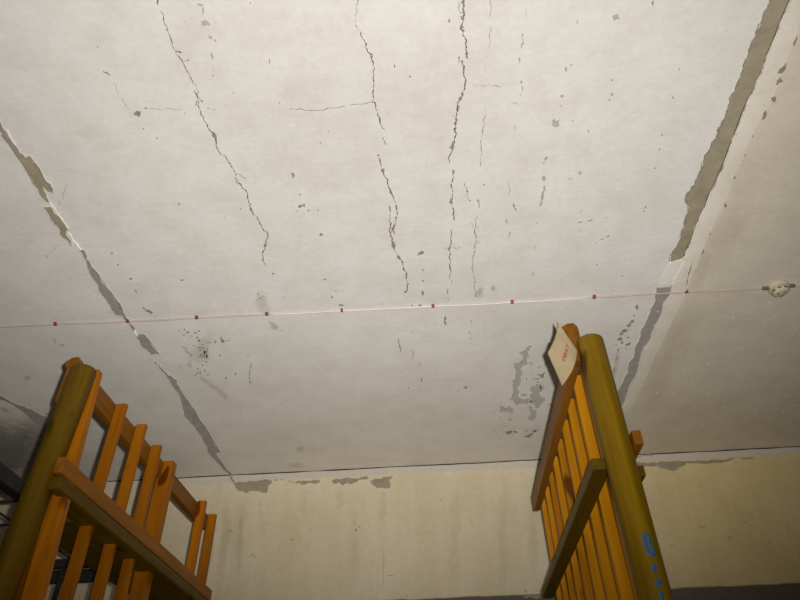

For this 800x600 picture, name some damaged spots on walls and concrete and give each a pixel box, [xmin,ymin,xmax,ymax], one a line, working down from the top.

crack [103,0,274,275]
crack [291,0,409,293]
crack [445,0,499,297]
flaking render [669,0,790,262]
flaking render [0,119,320,493]
flaking render [332,476,393,489]
peeling [492,342,552,440]
flaking render [615,286,671,406]